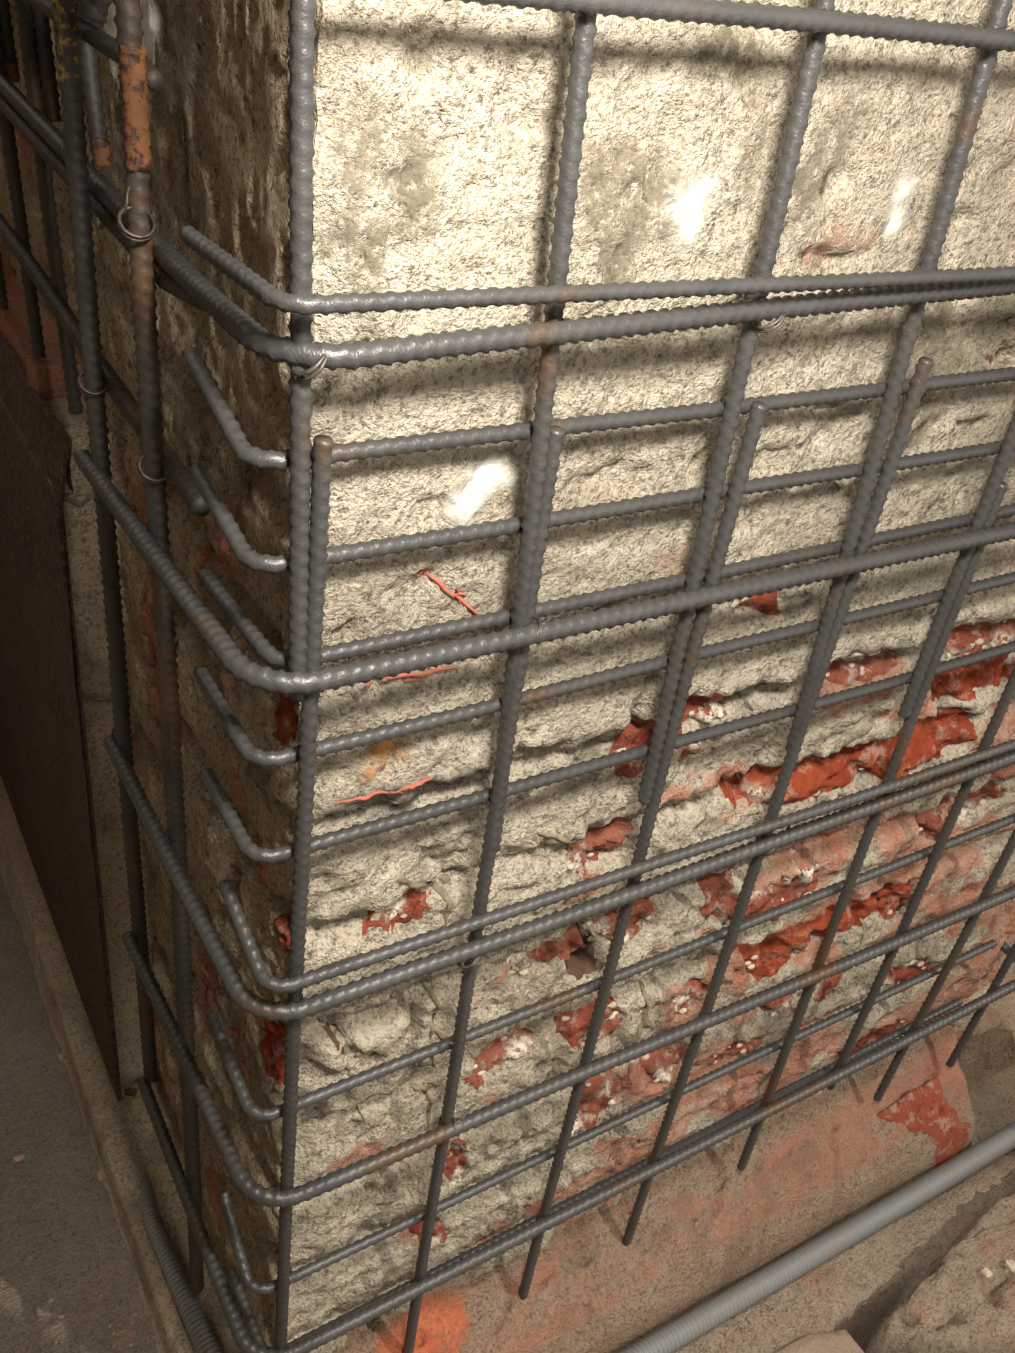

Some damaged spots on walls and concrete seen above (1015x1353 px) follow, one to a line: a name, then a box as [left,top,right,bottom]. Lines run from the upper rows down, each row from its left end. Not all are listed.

spalling [73,357,1015,1353]